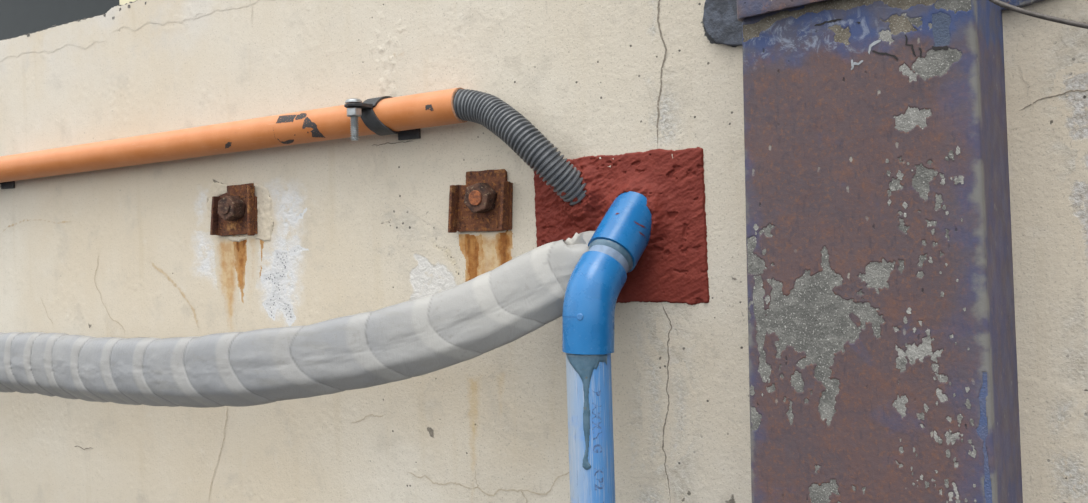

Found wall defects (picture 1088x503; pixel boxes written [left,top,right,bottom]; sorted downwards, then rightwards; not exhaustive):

crack [0,0,272,62]
crack [646,0,675,149]
peeling [743,0,971,46]
peeling [893,106,932,132]
peeling [899,46,962,83]
rust [213,234,264,332]
peeling [363,188,460,305]
rust [455,227,517,283]
peeling [886,146,964,278]
peeling [1029,0,1088,394]
crack [630,305,698,501]
peeling [722,224,992,503]